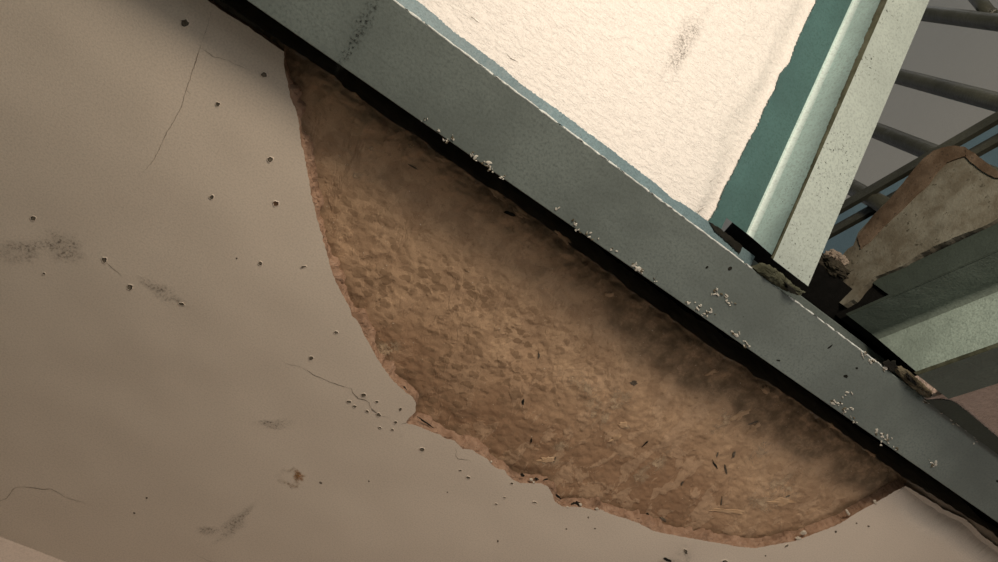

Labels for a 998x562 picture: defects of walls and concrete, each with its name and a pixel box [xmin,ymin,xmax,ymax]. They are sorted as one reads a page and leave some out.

crack [146,21,247,169]
spalling [256,28,908,548]